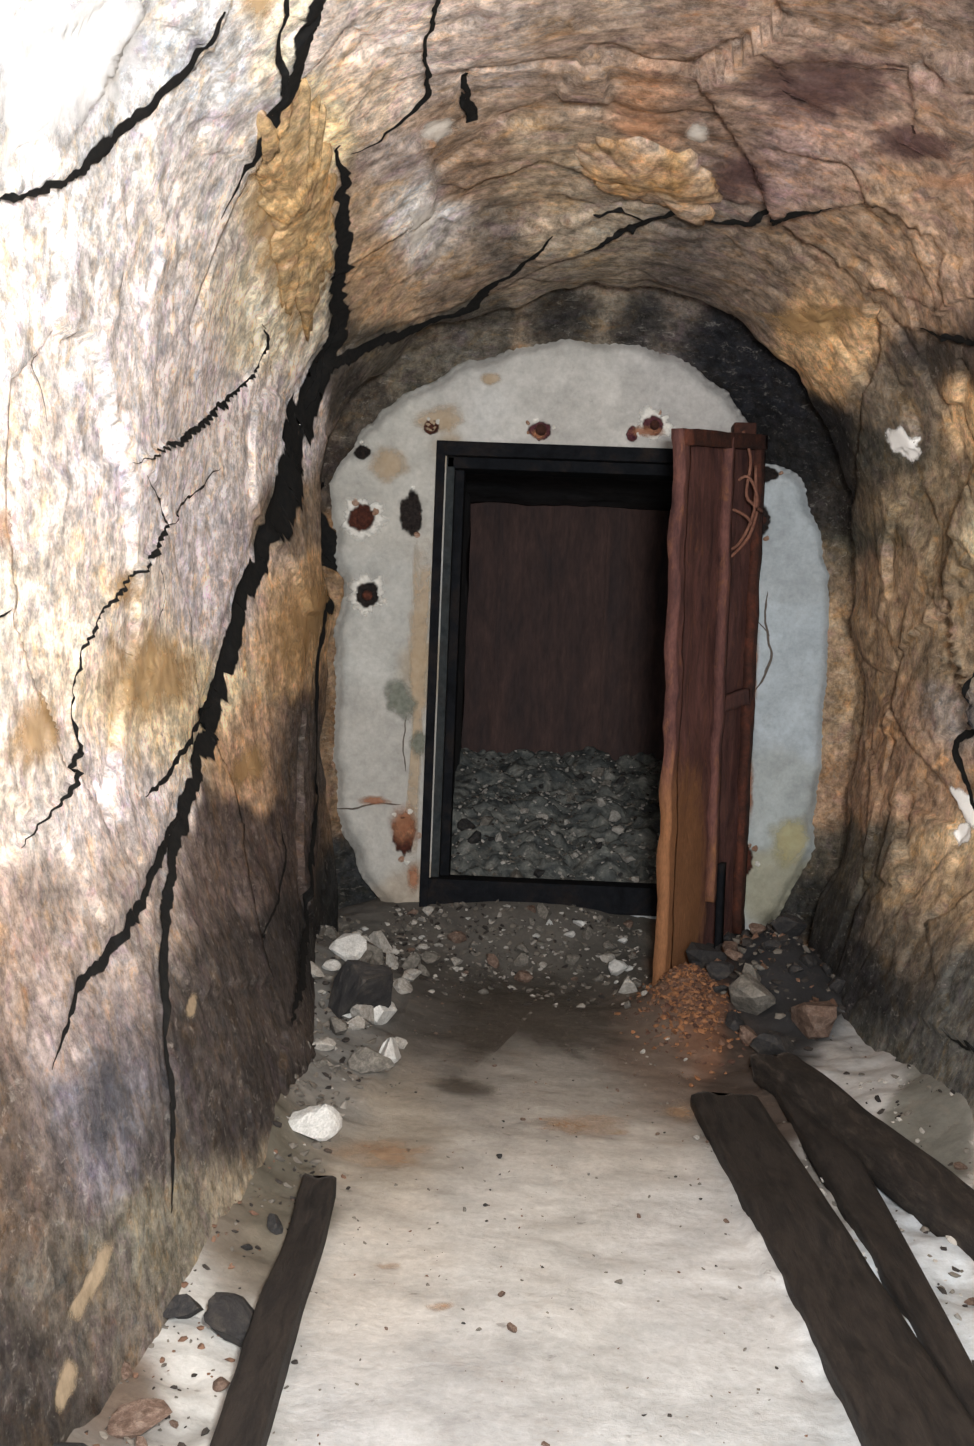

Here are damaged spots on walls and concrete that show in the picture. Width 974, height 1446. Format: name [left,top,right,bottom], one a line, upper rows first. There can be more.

crack [584,207,832,253]
crack [920,328,974,346]
crack [0,0,553,1214]
crack [756,592,773,689]
rust [393,571,430,840]
crack [952,673,974,809]
crack [941,1028,974,1052]